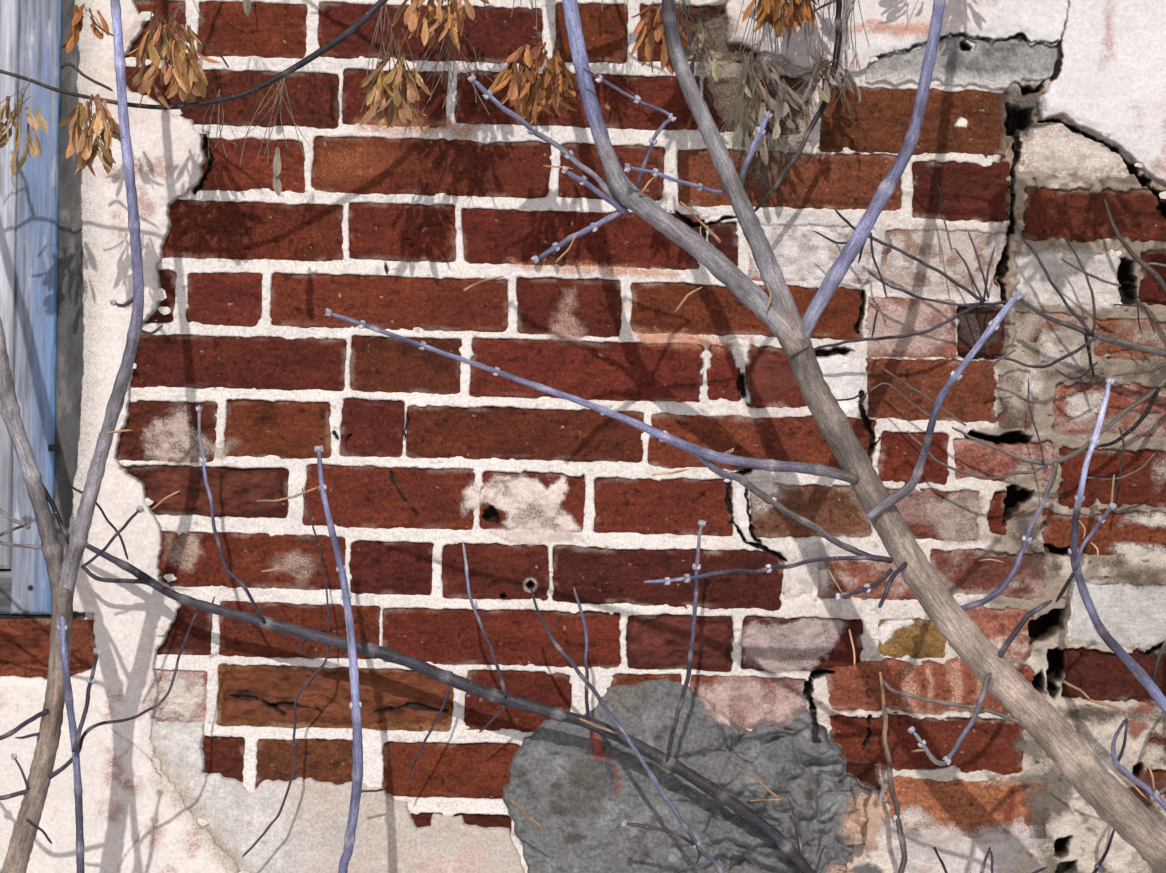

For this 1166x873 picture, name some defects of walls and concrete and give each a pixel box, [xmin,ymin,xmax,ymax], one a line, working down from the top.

crack [1018,1,1070,81]
flaking render [126,85,209,325]
spalling [815,347,851,357]
crack [859,390,880,457]
peeling [461,475,581,546]
crack [725,468,788,561]
spalling [1002,484,1069,577]
spalling [112,351,284,873]
spalling [221,668,452,725]
spalling [629,614,732,667]
spalling [1028,609,1063,697]
spalling [1127,700,1166,812]